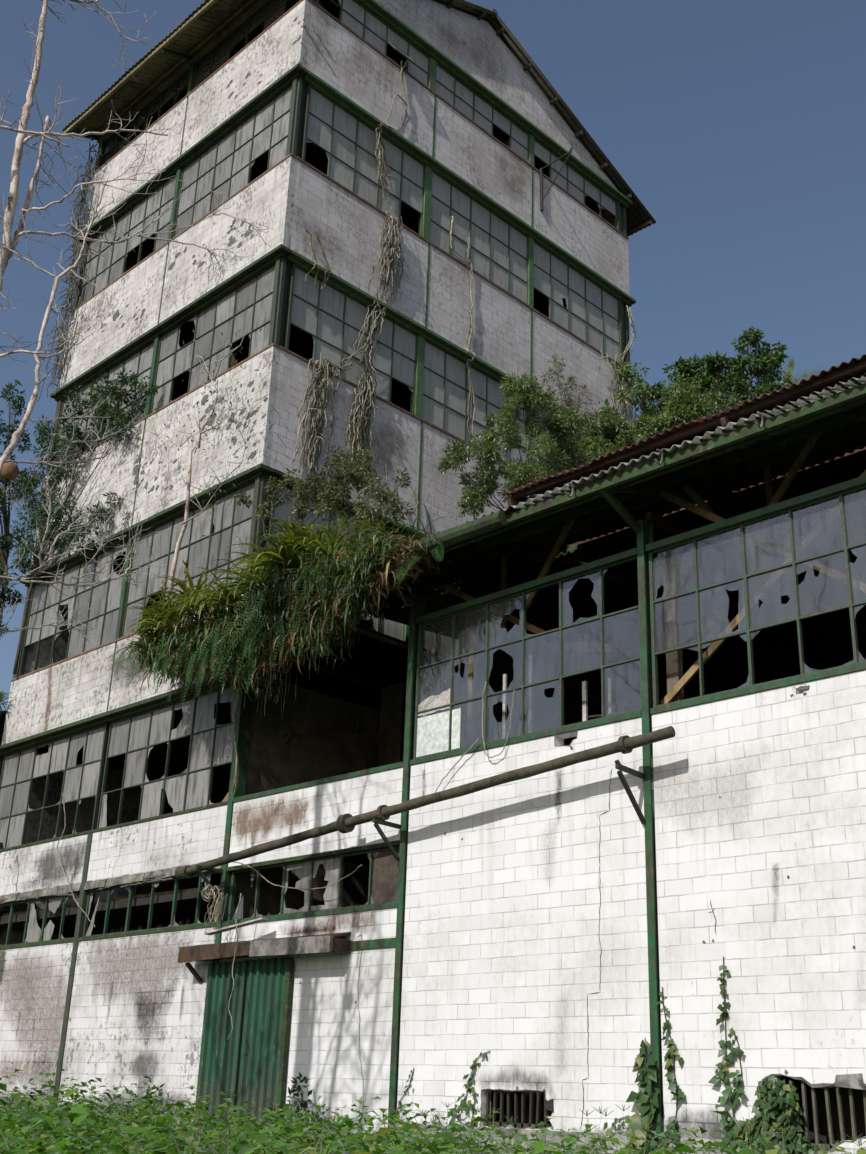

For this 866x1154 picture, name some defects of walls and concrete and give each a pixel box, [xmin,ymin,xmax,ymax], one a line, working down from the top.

water stain [0,949,71,1108]
water stain [90,932,200,1042]